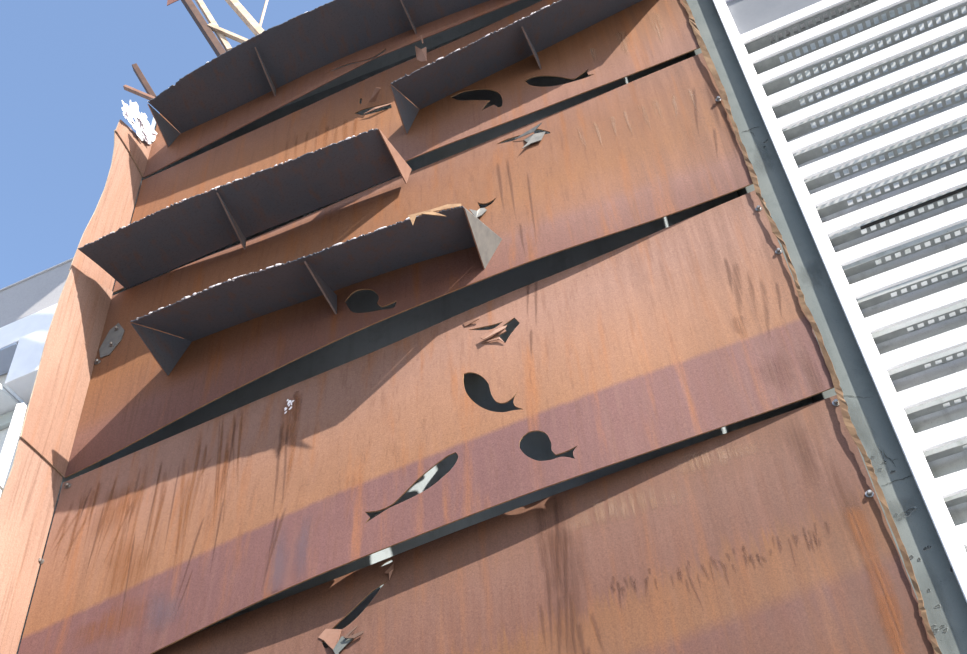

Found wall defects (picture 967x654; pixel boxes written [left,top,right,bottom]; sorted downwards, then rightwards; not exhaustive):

peeling [122,100,157,144]